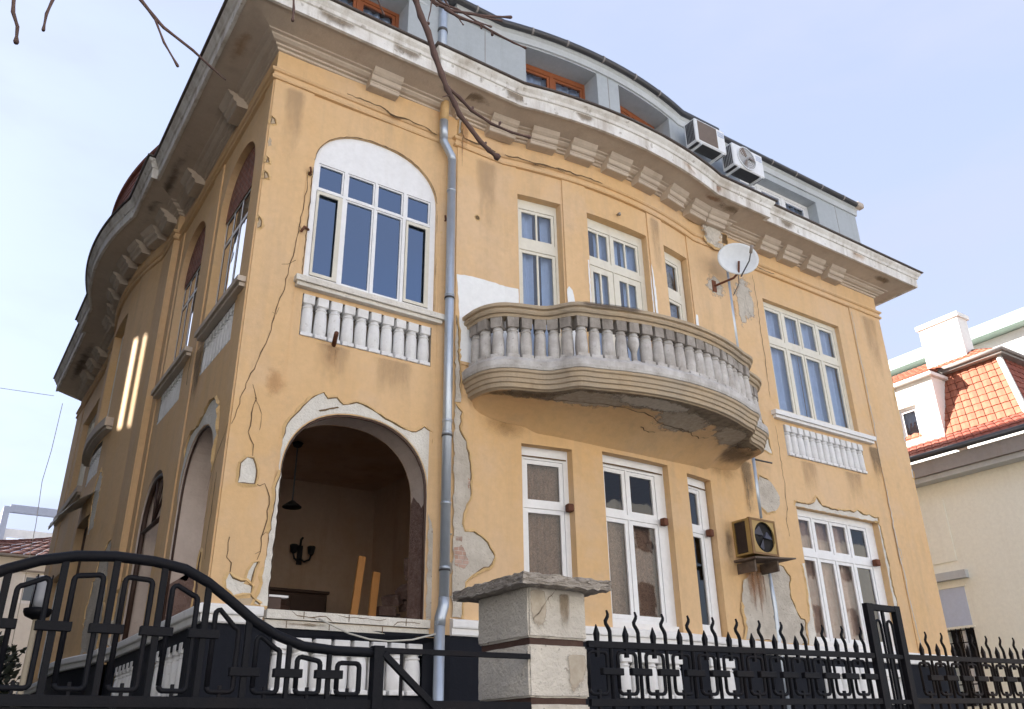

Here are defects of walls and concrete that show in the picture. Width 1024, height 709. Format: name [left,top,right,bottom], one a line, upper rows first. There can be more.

crack [347,93,437,135]
crack [461,129,601,183]
spalling [703,233,729,250]
crack [203,136,438,571]
spalling [553,391,628,408]
spalling [655,411,747,448]
spalling [222,390,433,620]
spalling [450,315,496,619]
spalling [757,473,780,515]
spalling [793,495,898,606]
spalling [741,563,816,645]